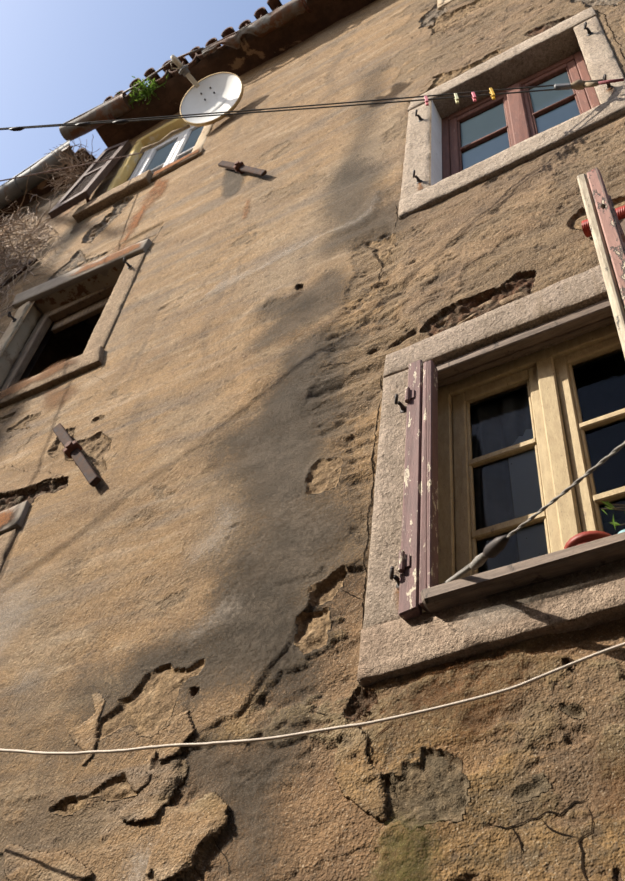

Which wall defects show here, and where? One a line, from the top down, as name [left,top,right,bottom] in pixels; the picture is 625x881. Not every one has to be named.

spalling [570,0,625,8]
spalling [419,270,536,336]
spalling [47,415,112,476]
peeling [0,465,68,512]
spalling [294,564,348,655]
peeling [49,658,229,881]
crack [481,794,593,881]